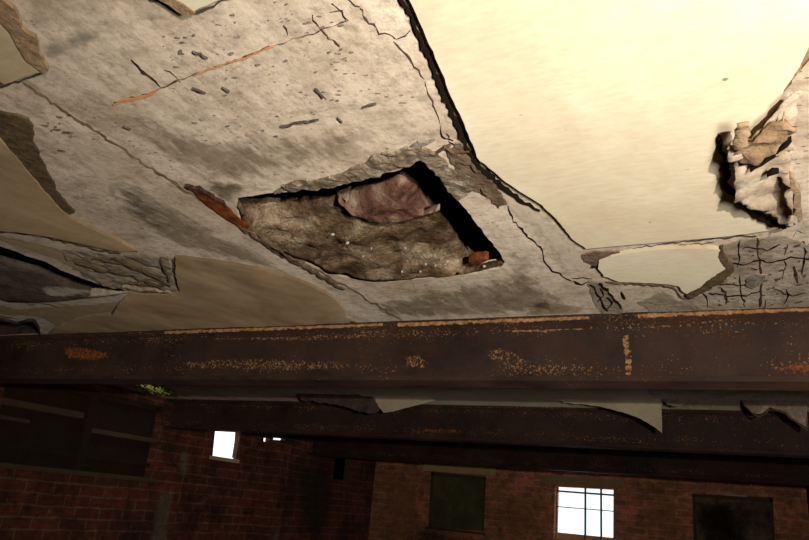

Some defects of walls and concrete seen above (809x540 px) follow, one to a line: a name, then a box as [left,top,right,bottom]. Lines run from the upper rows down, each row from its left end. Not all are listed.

corrosion [185,184,280,256]
spalling [237,138,507,282]
crack [633,234,768,249]
spalling [0,246,179,296]
crack [74,275,123,291]
spalling [582,250,620,268]
spalling [588,280,626,314]
spalling [637,235,809,312]
corrosion [638,308,809,327]
corrosion [64,346,108,361]
corrosion [623,327,632,375]
peeling [740,400,809,431]